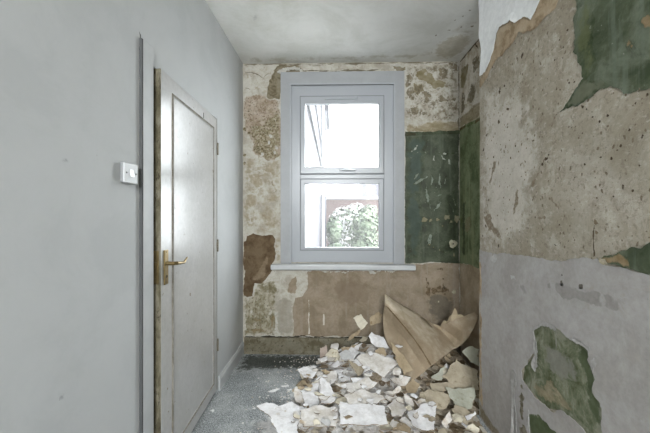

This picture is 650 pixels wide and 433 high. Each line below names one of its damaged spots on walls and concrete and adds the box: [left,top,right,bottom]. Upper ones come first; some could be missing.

spalling [243,64,305,165]
peeling [392,53,570,253]
peeling [243,233,281,297]
flaking render [287,262,483,407]
peeling [509,321,602,433]